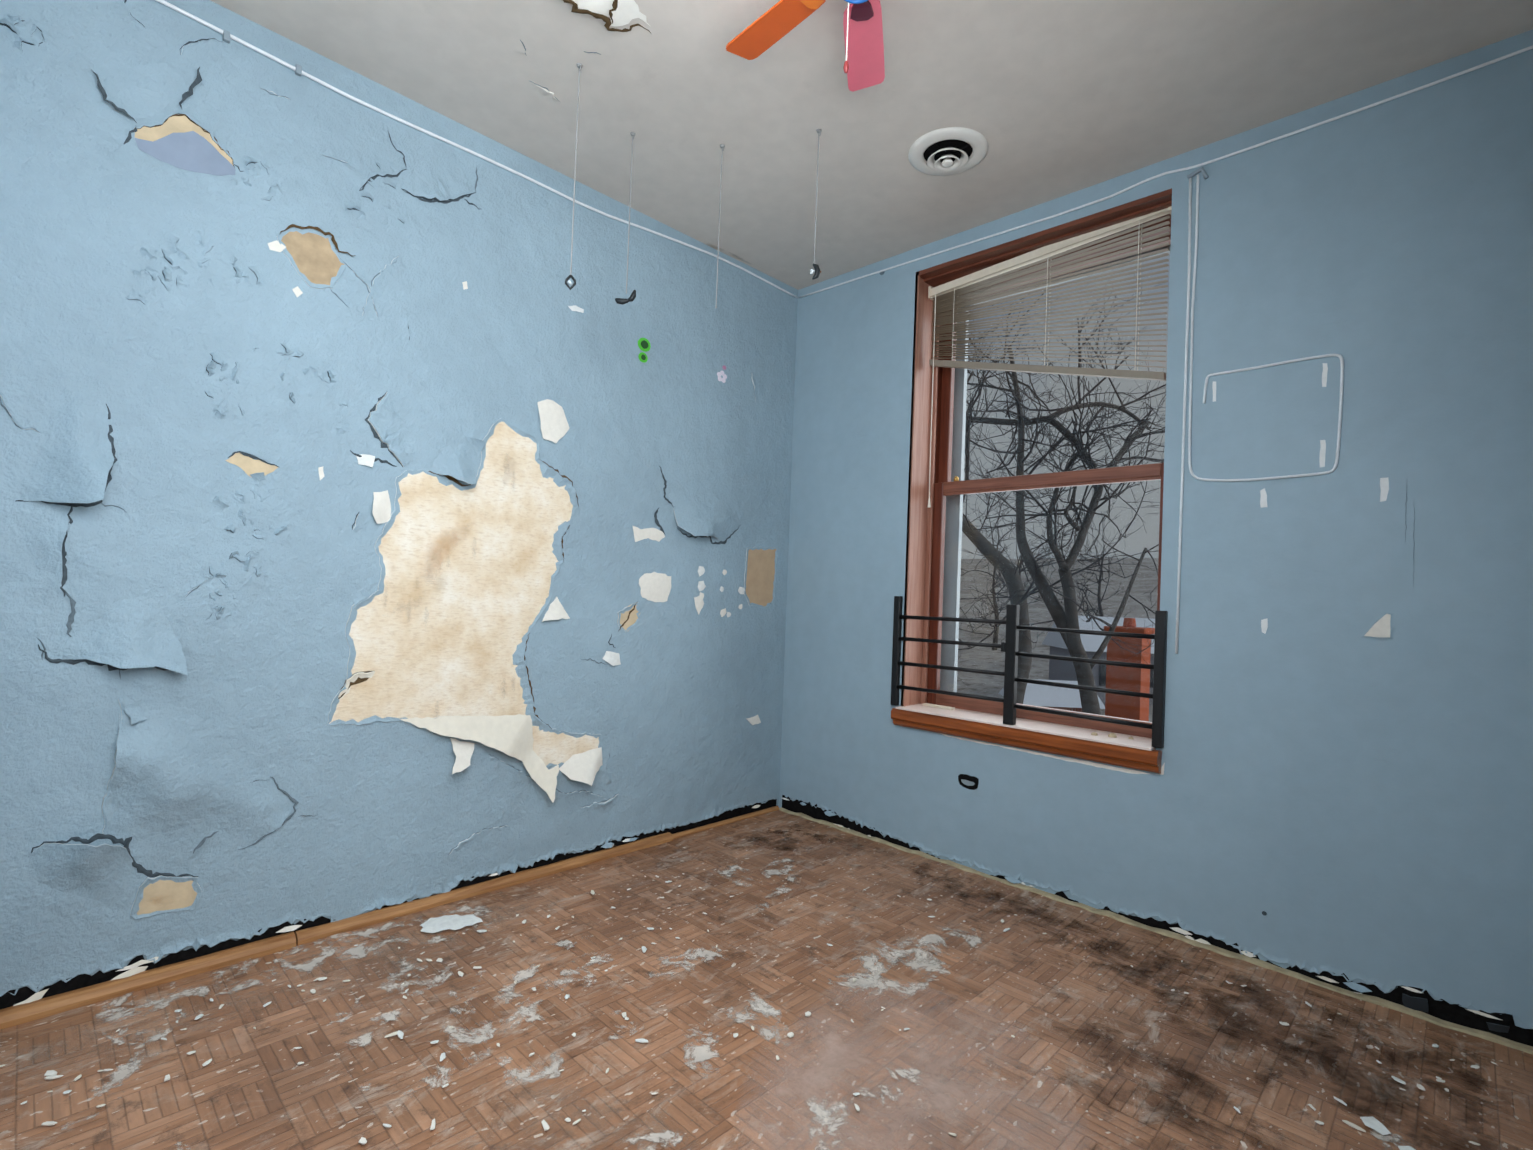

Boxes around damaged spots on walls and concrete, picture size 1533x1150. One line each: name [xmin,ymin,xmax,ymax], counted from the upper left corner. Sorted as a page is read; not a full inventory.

peeling [562,0,651,33]
peeling [90,20,243,176]
crack [329,132,479,209]
peeling [268,224,356,306]
peeling [221,438,284,481]
crack [11,505,145,637]
peeling [326,399,603,803]
peeling [694,546,778,617]
crack [25,833,199,918]
spalling [0,791,1533,1047]
leakage [1205,979,1271,1040]
leakage [1282,1009,1480,1115]